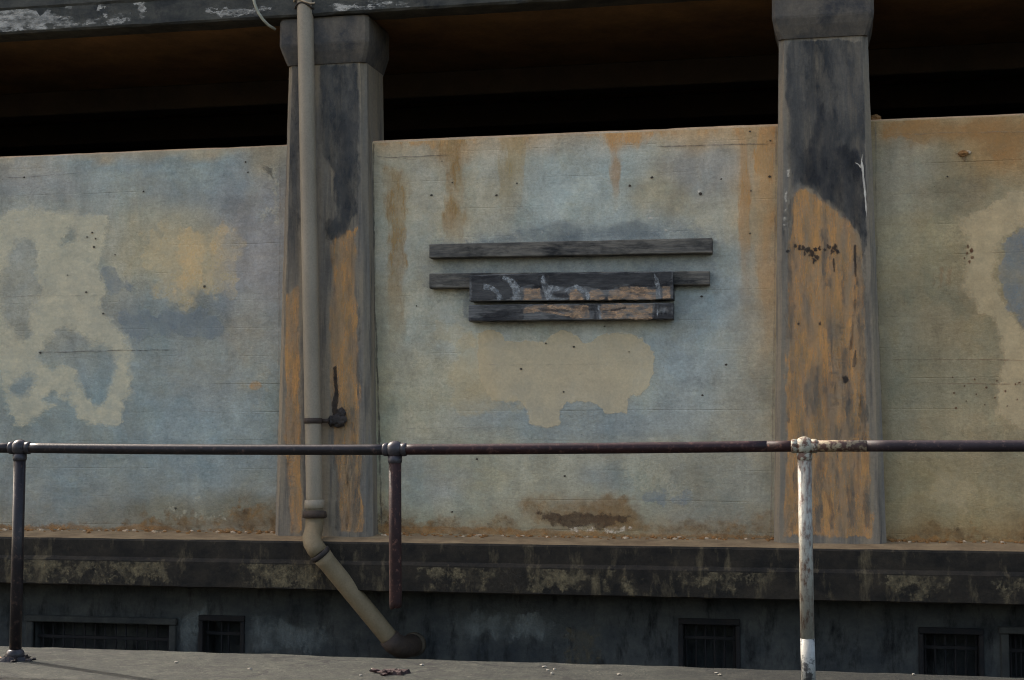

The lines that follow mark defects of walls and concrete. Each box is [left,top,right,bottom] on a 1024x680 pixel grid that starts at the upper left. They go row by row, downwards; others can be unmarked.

leakage [320,63,359,239]
rust [285,227,364,531]
rust [784,189,874,538]